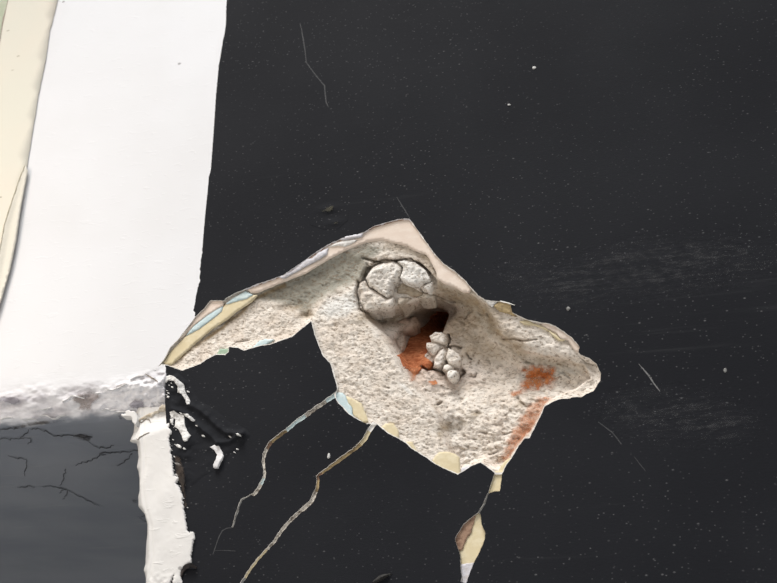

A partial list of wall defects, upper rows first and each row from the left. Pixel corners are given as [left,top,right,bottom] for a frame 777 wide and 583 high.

crack [0,428,138,506]
leakage [74,393,98,409]
crack [213,393,339,553]
crack [241,421,376,583]
flaking render [96,219,601,475]
corrosion [503,365,554,459]